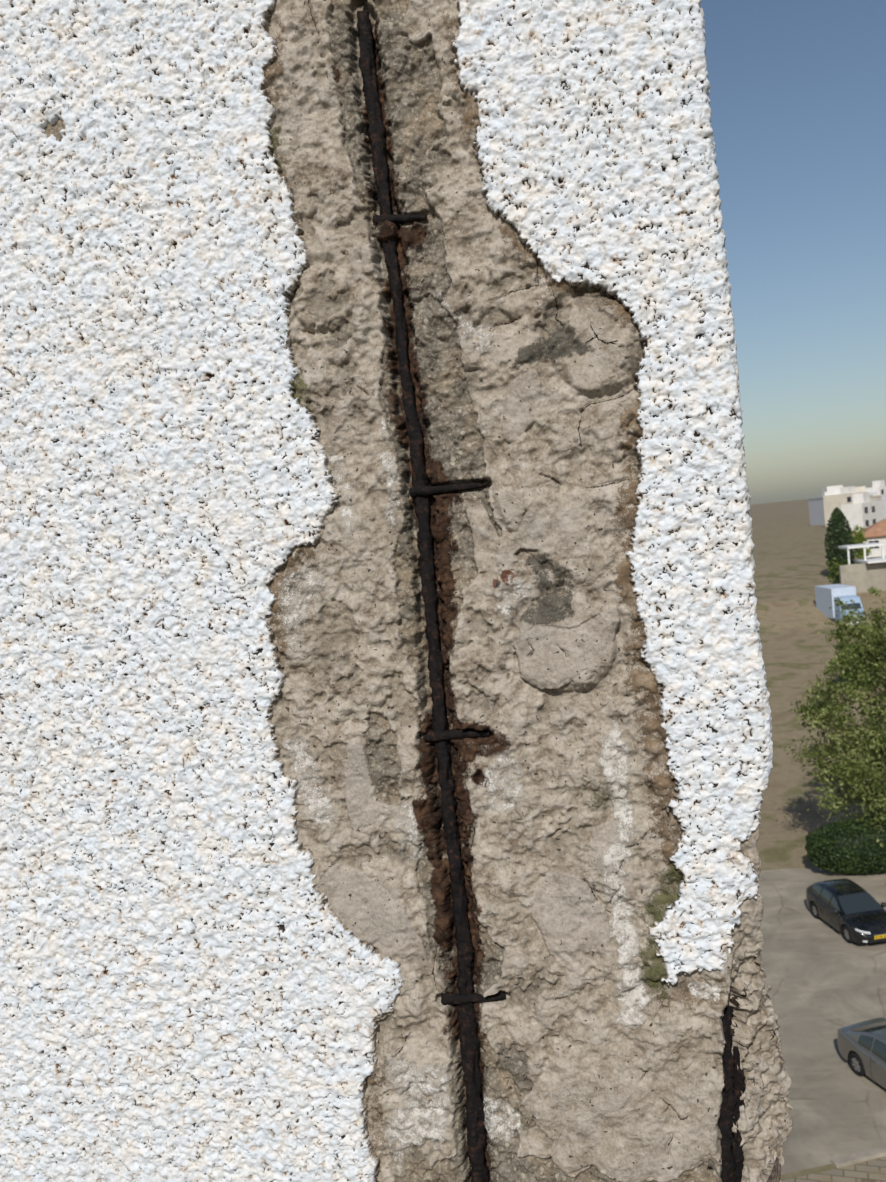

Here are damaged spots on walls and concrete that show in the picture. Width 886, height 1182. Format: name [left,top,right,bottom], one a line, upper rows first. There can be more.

rust [362,19,511,1182]
spalling [263,0,793,1182]